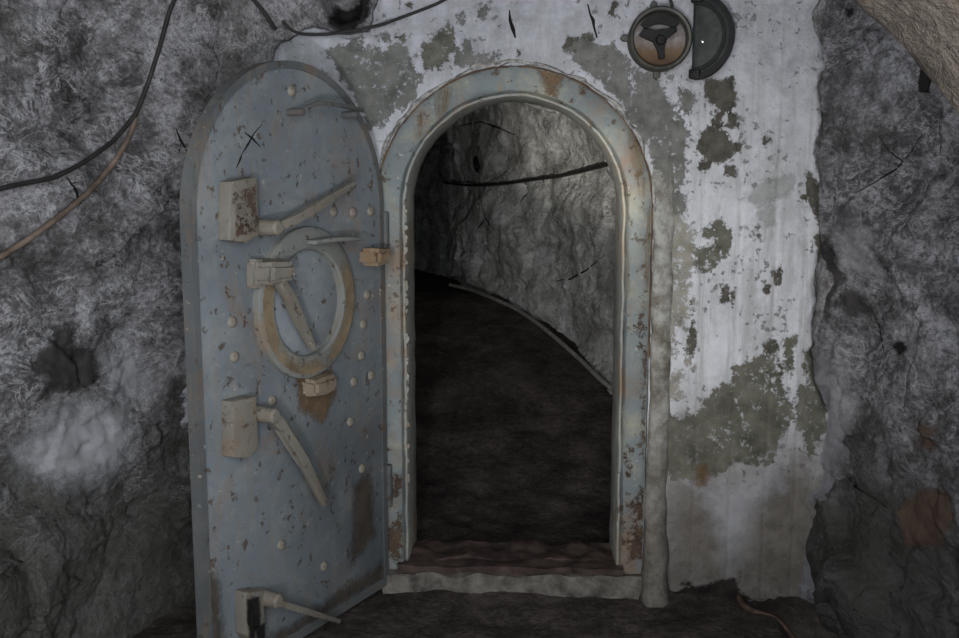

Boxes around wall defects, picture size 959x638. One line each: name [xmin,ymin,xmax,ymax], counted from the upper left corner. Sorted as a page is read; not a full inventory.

peeling [477,2,491,21]
peeling [325,10,502,131]
crack [857,134,922,192]
peeling [562,33,762,401]
corrosion [623,422,645,481]
peeling [668,334,843,511]
corrosion [621,487,644,566]
peeling [800,555,815,600]